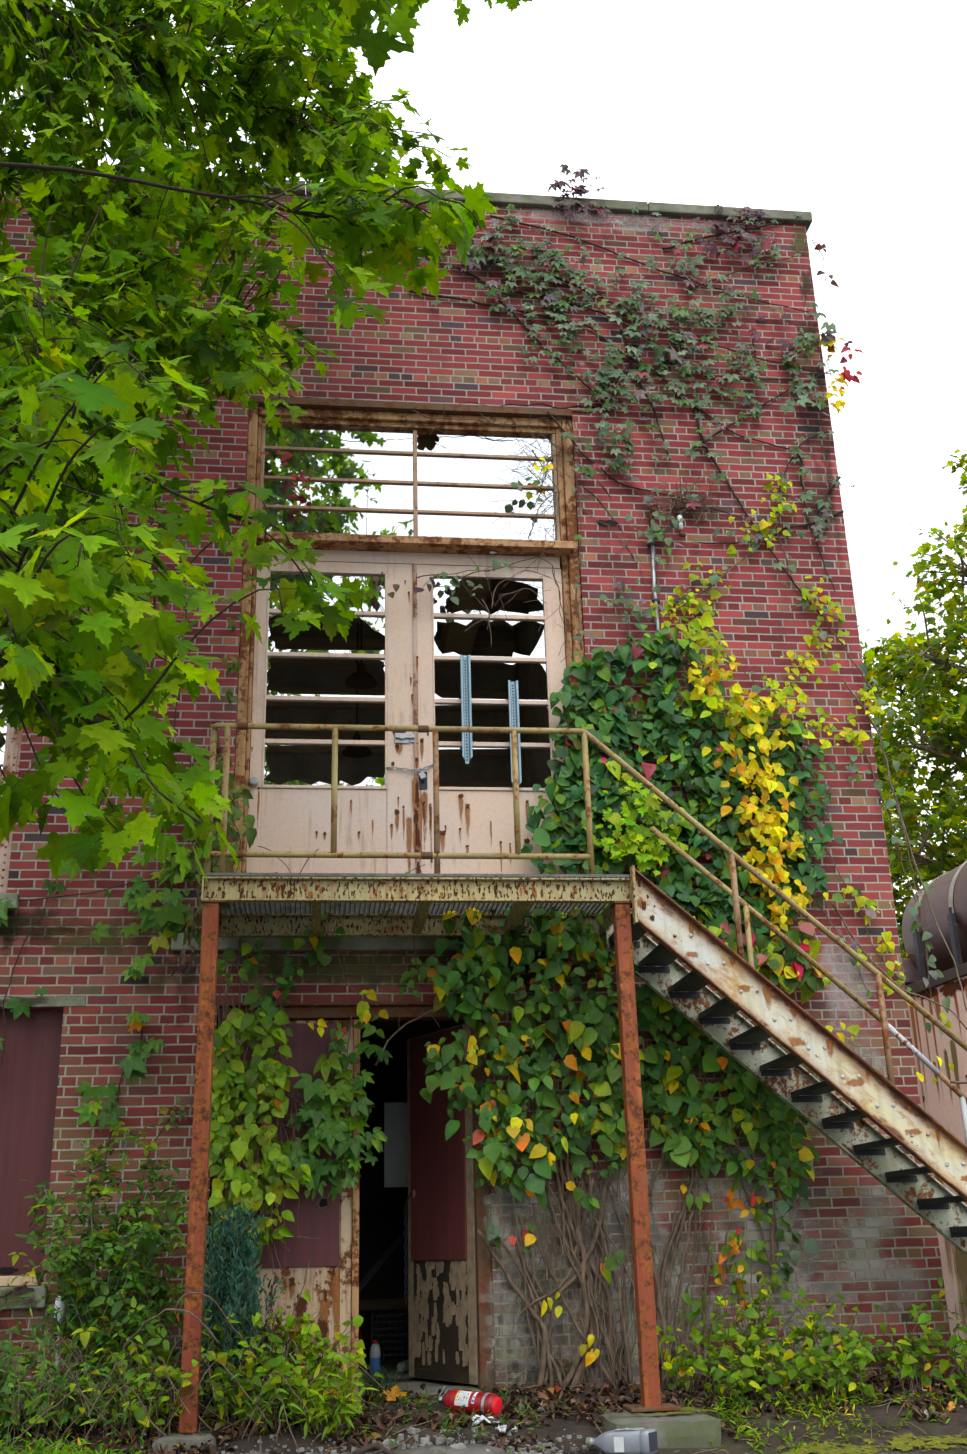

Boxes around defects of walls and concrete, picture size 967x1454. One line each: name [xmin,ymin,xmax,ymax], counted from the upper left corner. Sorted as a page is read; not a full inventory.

corrosion [220,731,611,900]
corrosion [637,879,666,921]
corrosion [739,985,772,1005]
corrosion [847,1071,870,1086]
corrosion [905,978,967,1142]
damp [933,1040,960,1097]
peeling [412,1261,470,1367]